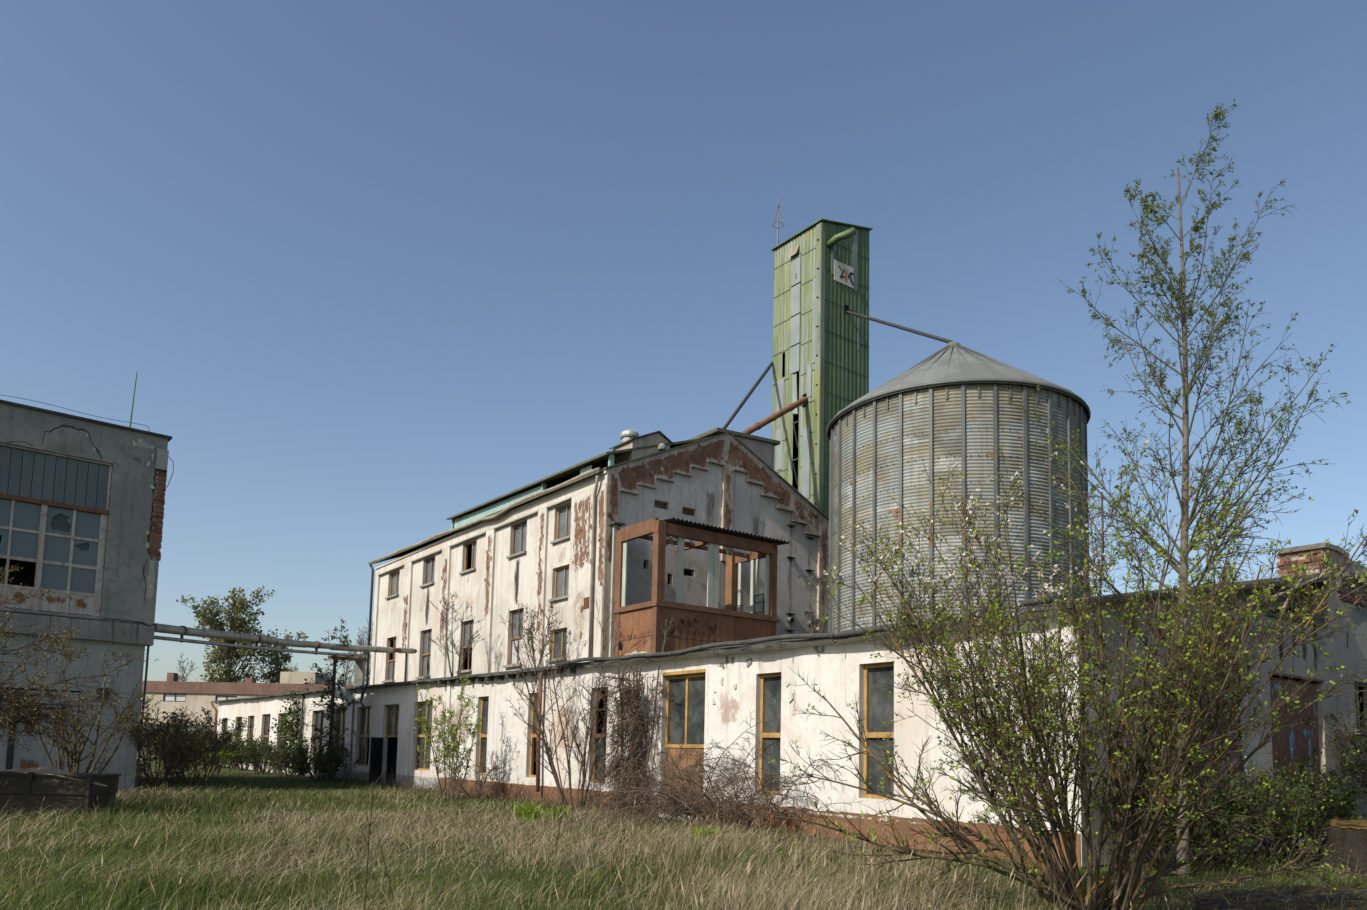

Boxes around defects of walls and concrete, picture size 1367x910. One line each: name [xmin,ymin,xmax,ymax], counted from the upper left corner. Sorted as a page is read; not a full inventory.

crack [10,423,102,458]
flaking render [133,438,169,599]
peeling [568,440,829,656]
rust [46,595,86,608]
flaking render [1336,567,1367,630]
peeling [712,656,752,722]